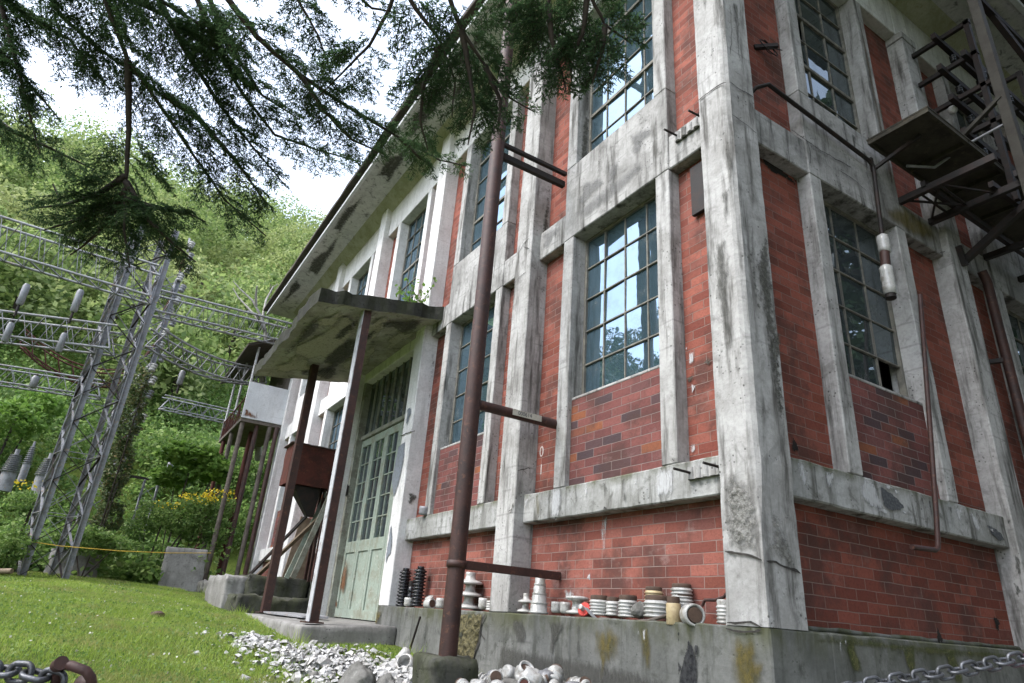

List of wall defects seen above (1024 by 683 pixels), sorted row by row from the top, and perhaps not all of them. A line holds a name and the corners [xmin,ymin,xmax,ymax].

water stain [717,242,727,328]
water stain [300,323,357,379]
water stain [750,240,783,412]
peeling [881,485,906,513]
water stain [498,621,649,683]